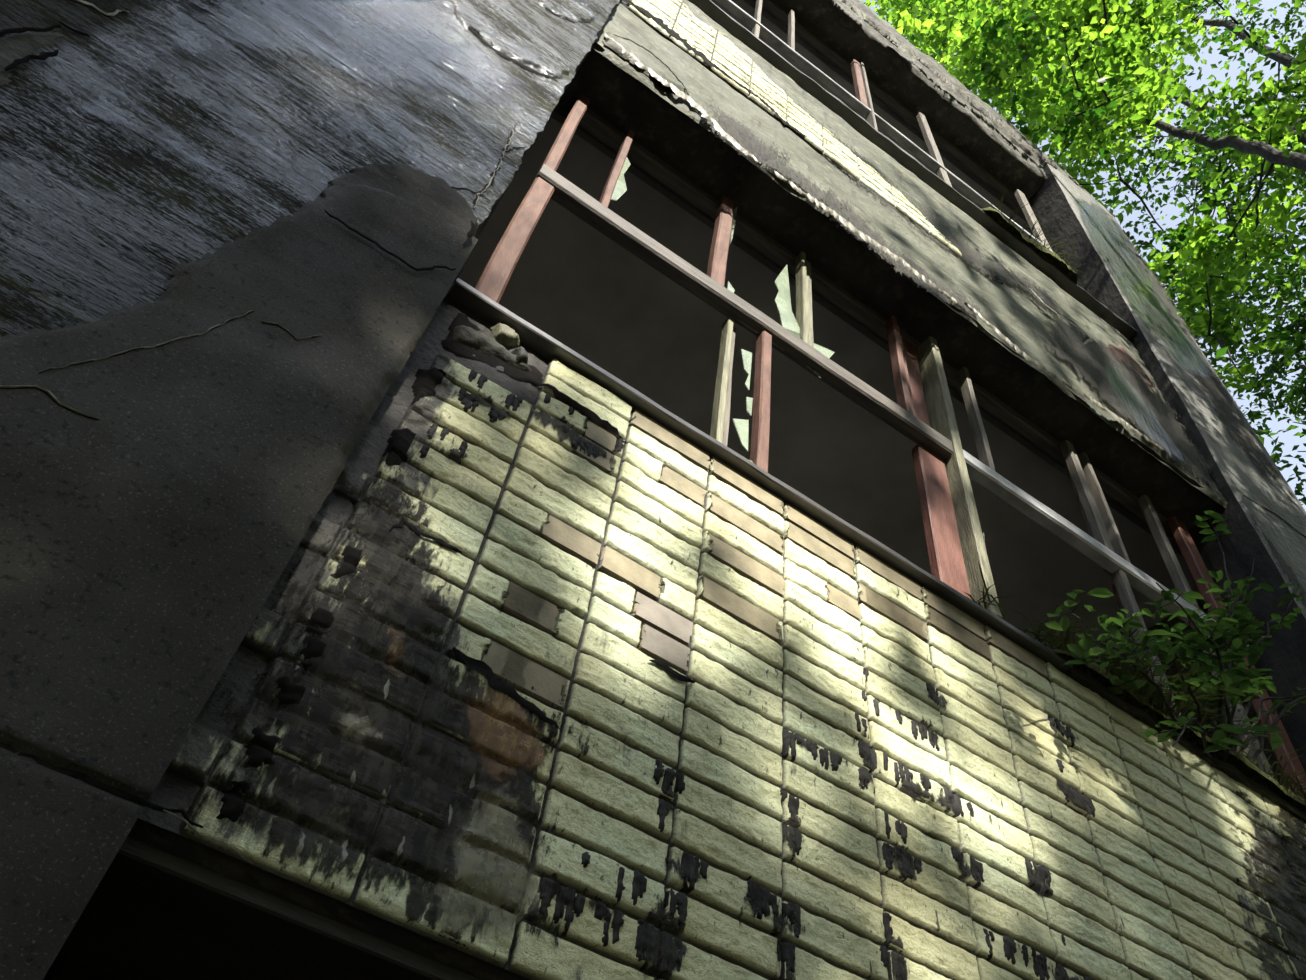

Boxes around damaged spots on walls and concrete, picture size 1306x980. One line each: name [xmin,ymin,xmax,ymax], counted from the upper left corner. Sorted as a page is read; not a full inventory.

leakage [63,0,526,217]
flaking render [319,163,478,272]
spalling [604,31,1164,451]
crack [0,310,322,420]
spalling [441,312,544,387]
spalling [382,428,416,466]
peeling [575,419,617,471]
peeling [542,515,693,671]
peeling [631,409,1050,678]
peeling [482,640,568,707]
crack [0,742,253,864]
leakage [1230,789,1306,980]